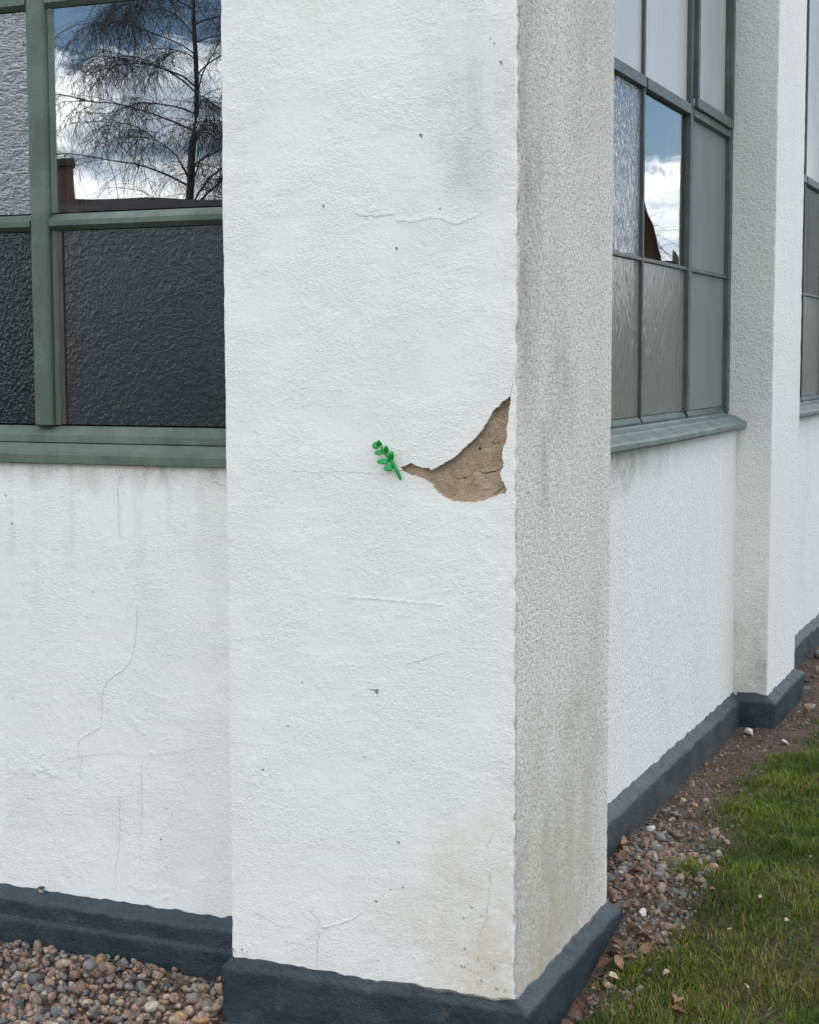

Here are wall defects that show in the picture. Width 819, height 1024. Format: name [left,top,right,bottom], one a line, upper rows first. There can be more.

spalling [401,397,511,503]
crack [59,604,212,888]